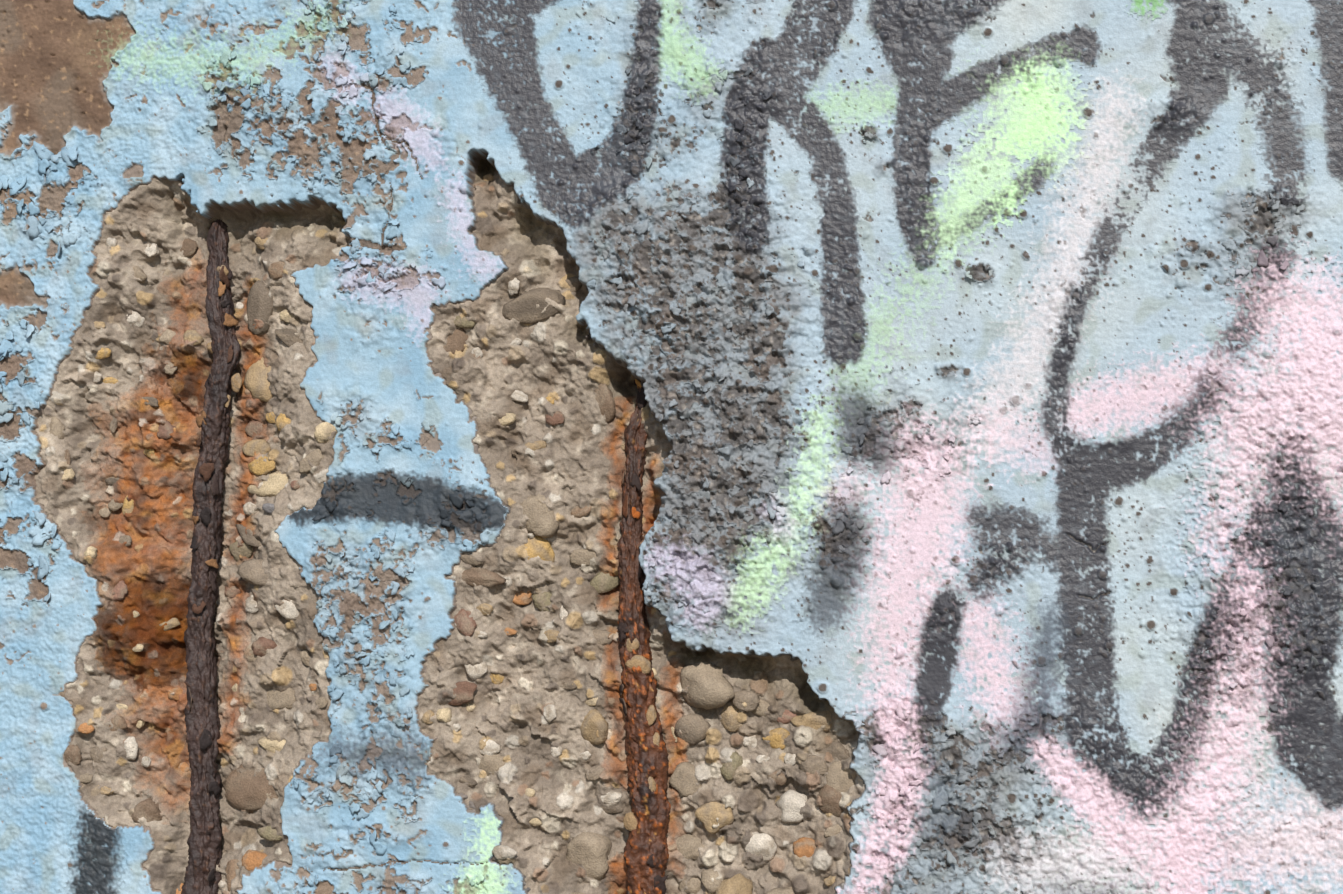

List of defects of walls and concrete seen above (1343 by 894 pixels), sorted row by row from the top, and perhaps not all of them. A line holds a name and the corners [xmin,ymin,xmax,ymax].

corrosion [72,235,213,827]
corrosion [213,258,276,774]
spalling [0,0,1069,894]
corrosion [594,394,637,794]
corrosion [604,851,628,894]
corrosion [638,451,664,549]
corrosion [656,657,689,880]